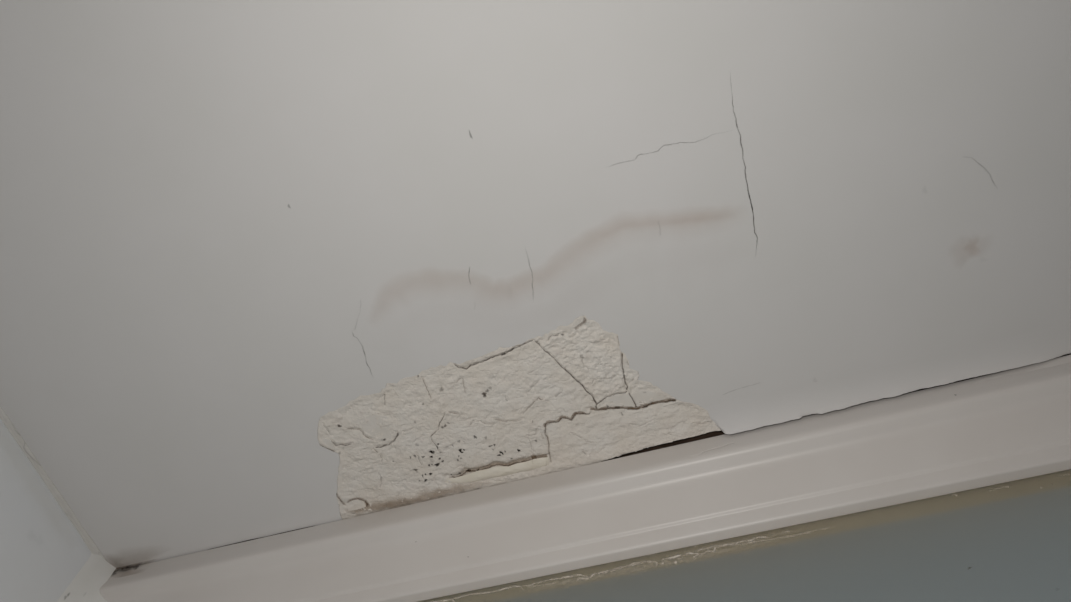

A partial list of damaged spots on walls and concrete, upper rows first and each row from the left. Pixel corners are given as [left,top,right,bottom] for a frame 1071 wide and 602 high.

flaking render [317,315,1071,520]